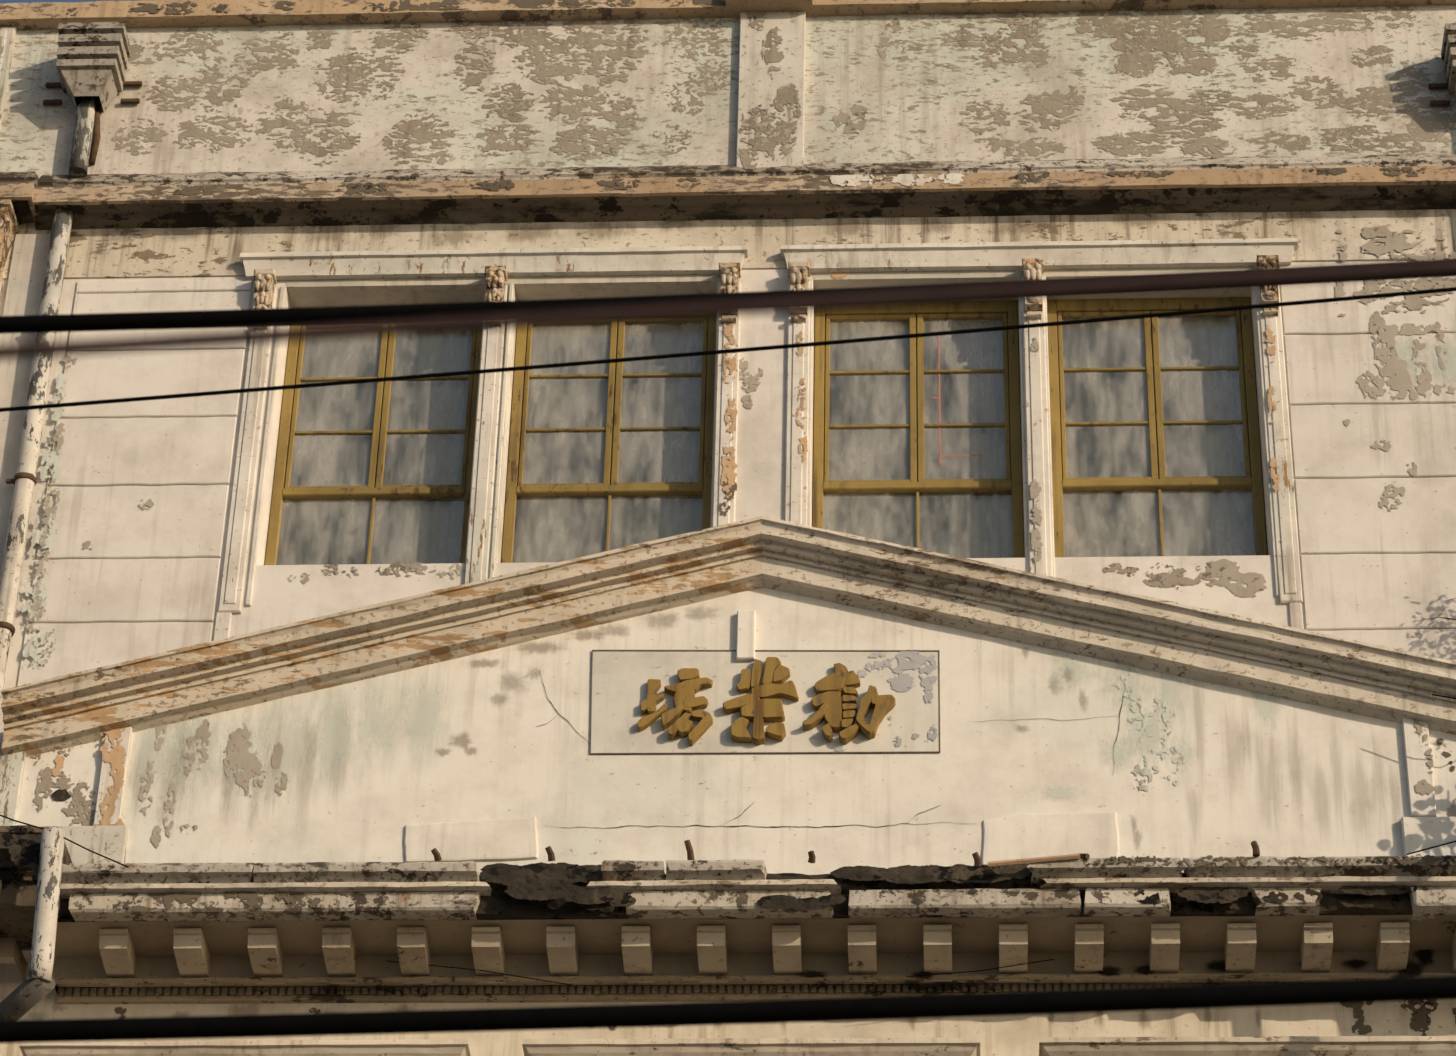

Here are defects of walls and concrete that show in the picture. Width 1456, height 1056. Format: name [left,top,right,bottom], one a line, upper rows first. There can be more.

peeling [109,0,736,169]
peeling [738,11,801,168]
peeling [830,173,965,187]
peeling [959,85,1086,181]
peeling [1075,5,1456,178]
peeling [1335,224,1456,403]
peeling [719,322,763,516]
peeling [1103,559,1267,598]
peeling [30,718,288,848]
crack [552,804,962,829]
flaking render [480,862,636,906]
flaking render [757,863,1032,910]